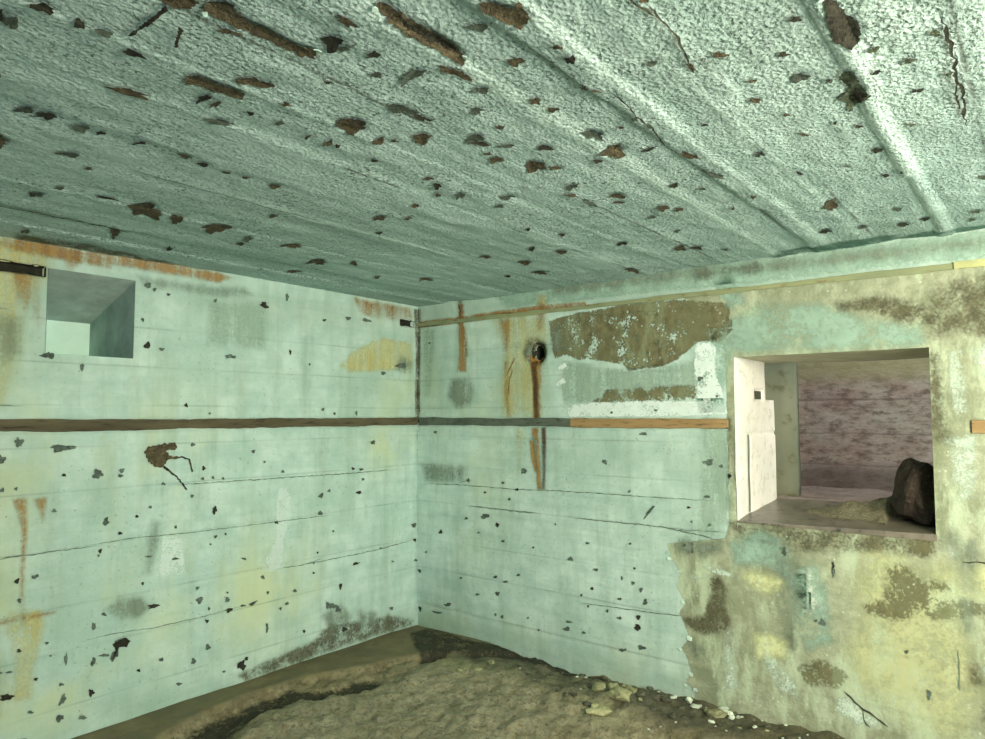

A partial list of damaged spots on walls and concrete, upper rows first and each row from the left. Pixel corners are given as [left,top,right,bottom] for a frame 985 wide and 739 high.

corrosion [0,240,225,353]
damp [348,310,433,422]
corrosion [356,300,586,489]
damp [500,225,985,405]
damp [930,352,976,498]
peeling [549,267,985,739]
damp [240,608,411,680]